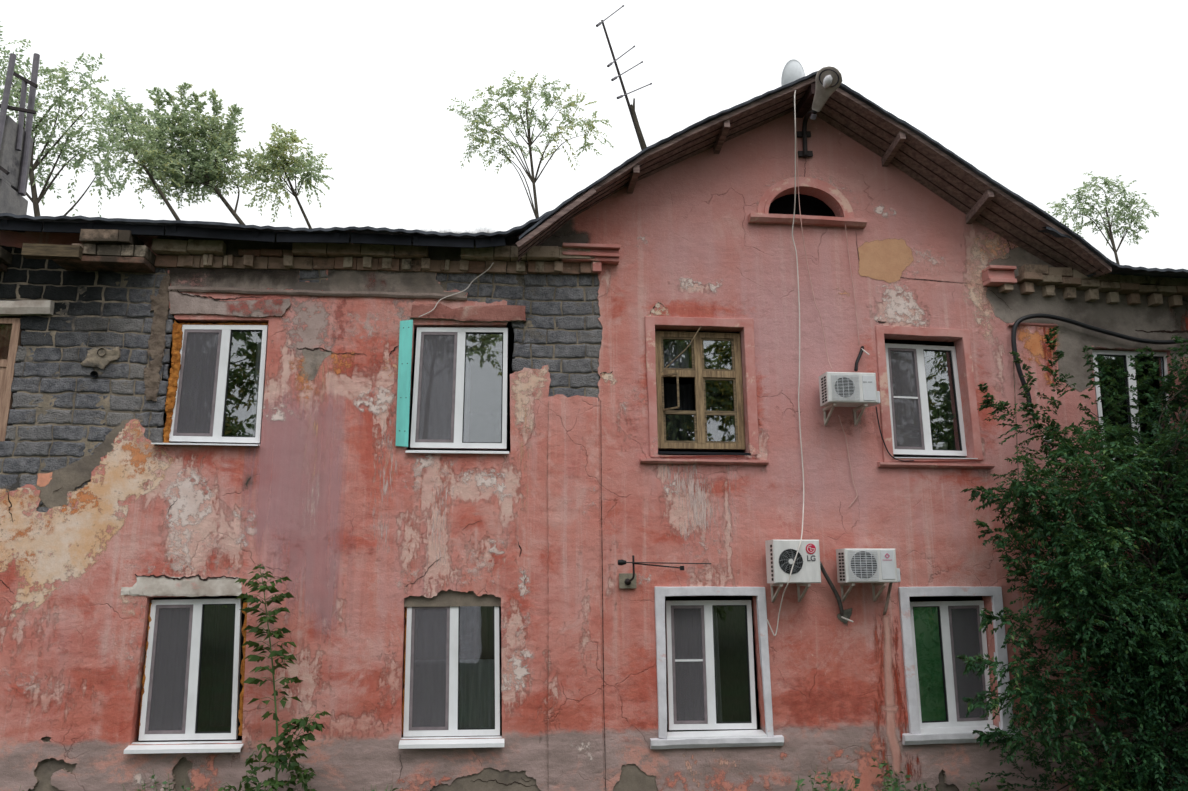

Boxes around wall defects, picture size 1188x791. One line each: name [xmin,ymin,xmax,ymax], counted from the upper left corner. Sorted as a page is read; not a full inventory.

peeling [858,238,943,327]
flaking render [964,232,1188,392]
flaking render [0,219,617,617]
peeling [663,464,720,554]
flaking render [30,758,77,791]
flaking render [398,761,541,791]
flaking render [613,748,790,791]
peeling [815,734,889,791]